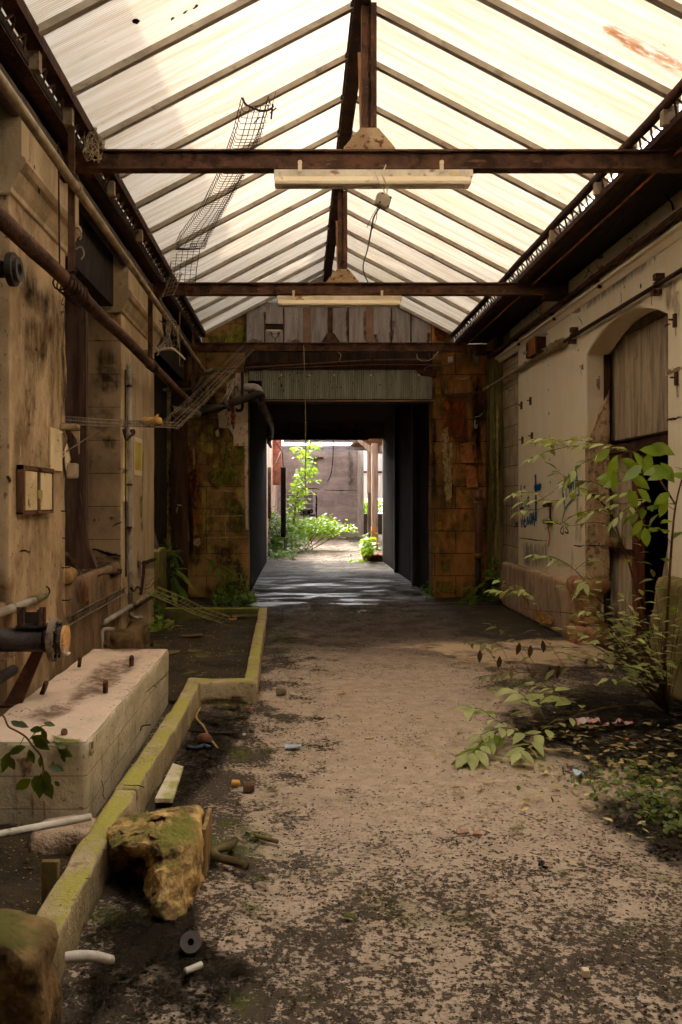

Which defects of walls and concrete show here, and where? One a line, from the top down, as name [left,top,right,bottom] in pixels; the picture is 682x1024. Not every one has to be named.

rust [604,26,682,71]
leakage [26,278,67,406]
leakage [432,419,453,503]